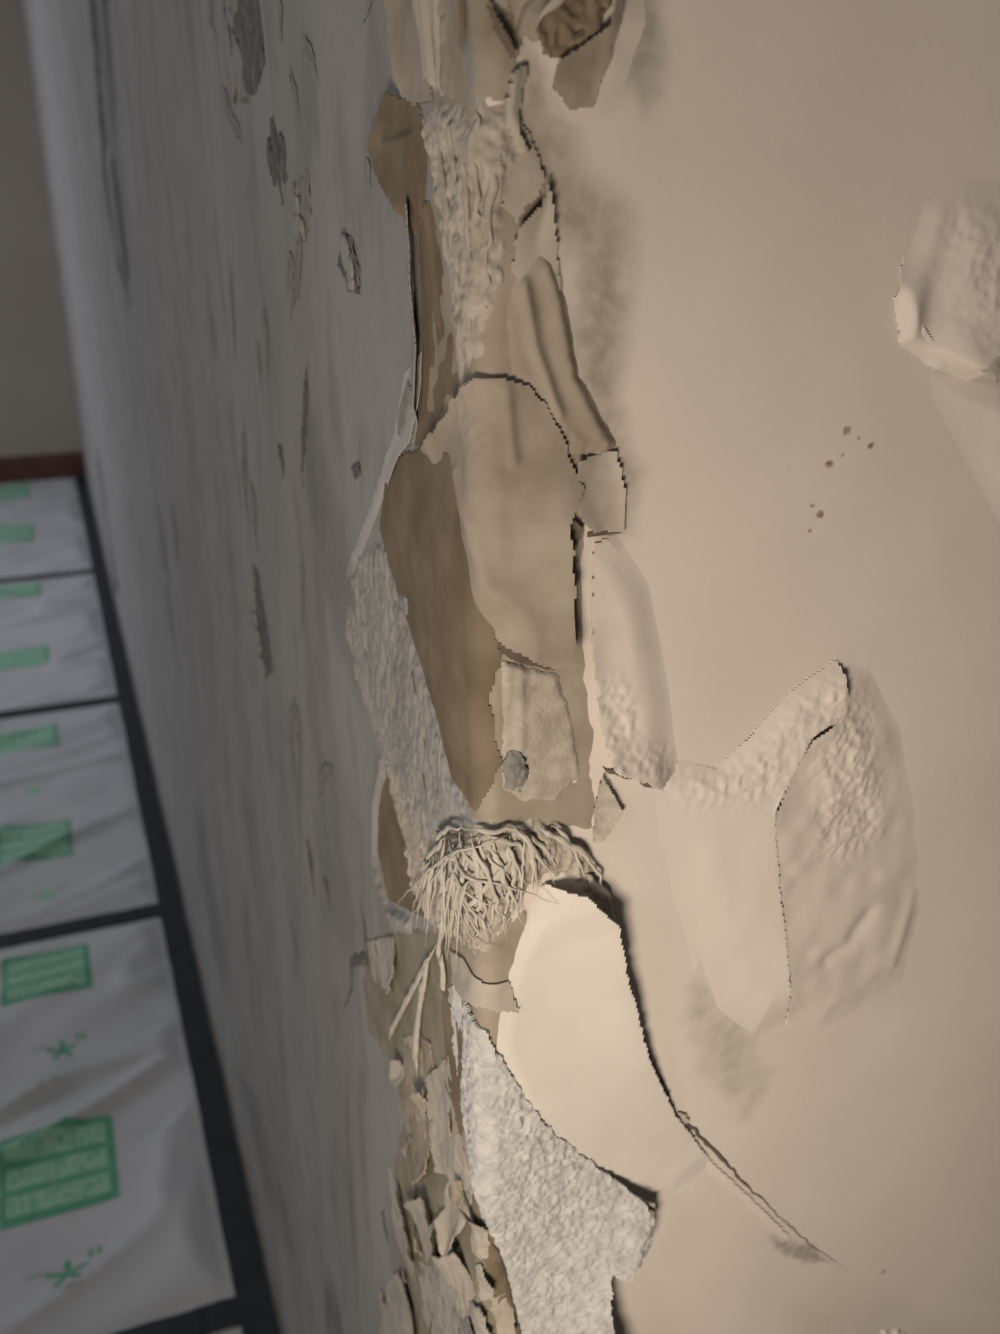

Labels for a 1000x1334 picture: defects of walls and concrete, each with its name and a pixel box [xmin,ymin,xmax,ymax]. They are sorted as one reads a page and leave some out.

spalling [223,0,264,104]
spalling [337,231,361,294]
peeling [345,0,678,843]
peeling [363,874,708,1334]
crack [671,1104,849,1273]